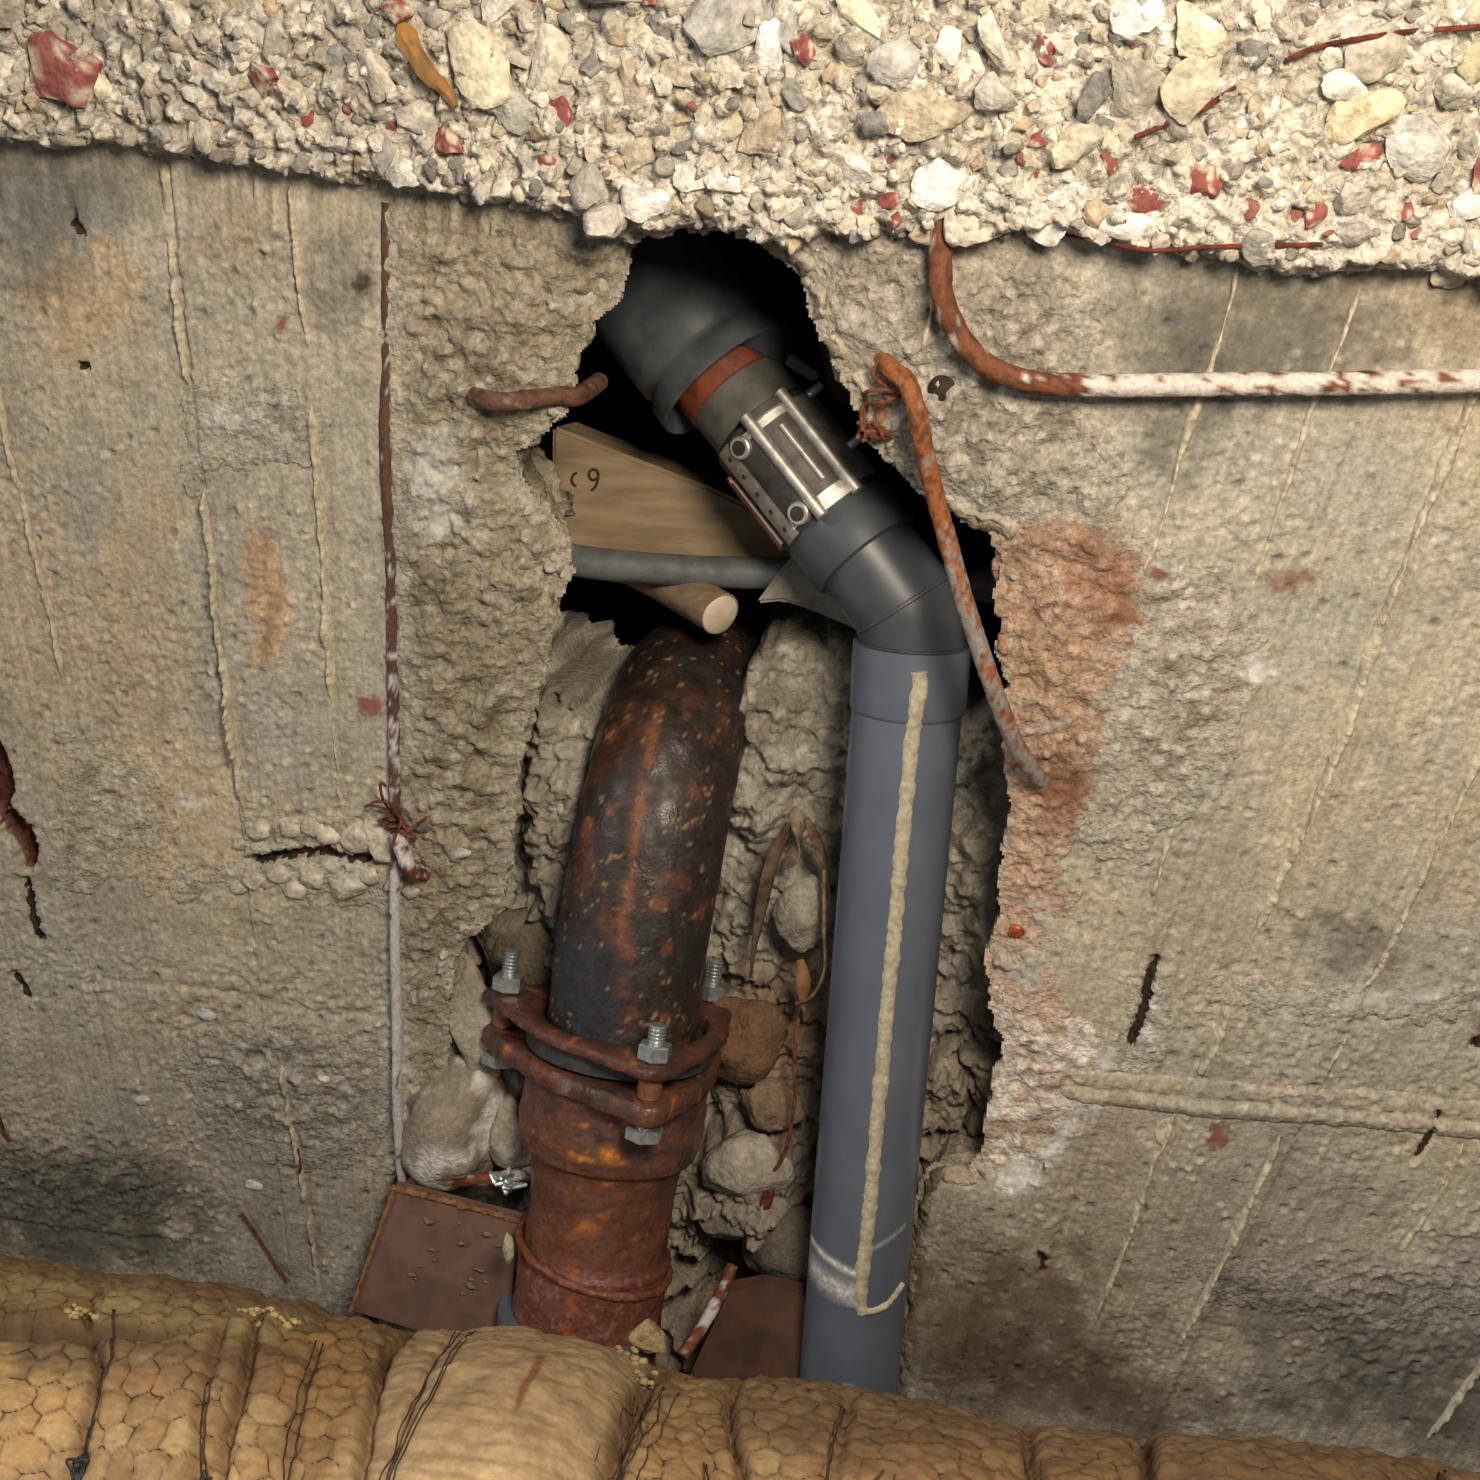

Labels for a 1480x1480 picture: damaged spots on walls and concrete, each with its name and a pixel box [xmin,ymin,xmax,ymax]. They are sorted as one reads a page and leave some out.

spalling [0,0,1480,1181]
corrosion [0,740,39,877]
crack [229,816,420,901]
crack [24,878,45,939]
crack [1127,955,1158,1044]
crack [1415,1110,1441,1156]